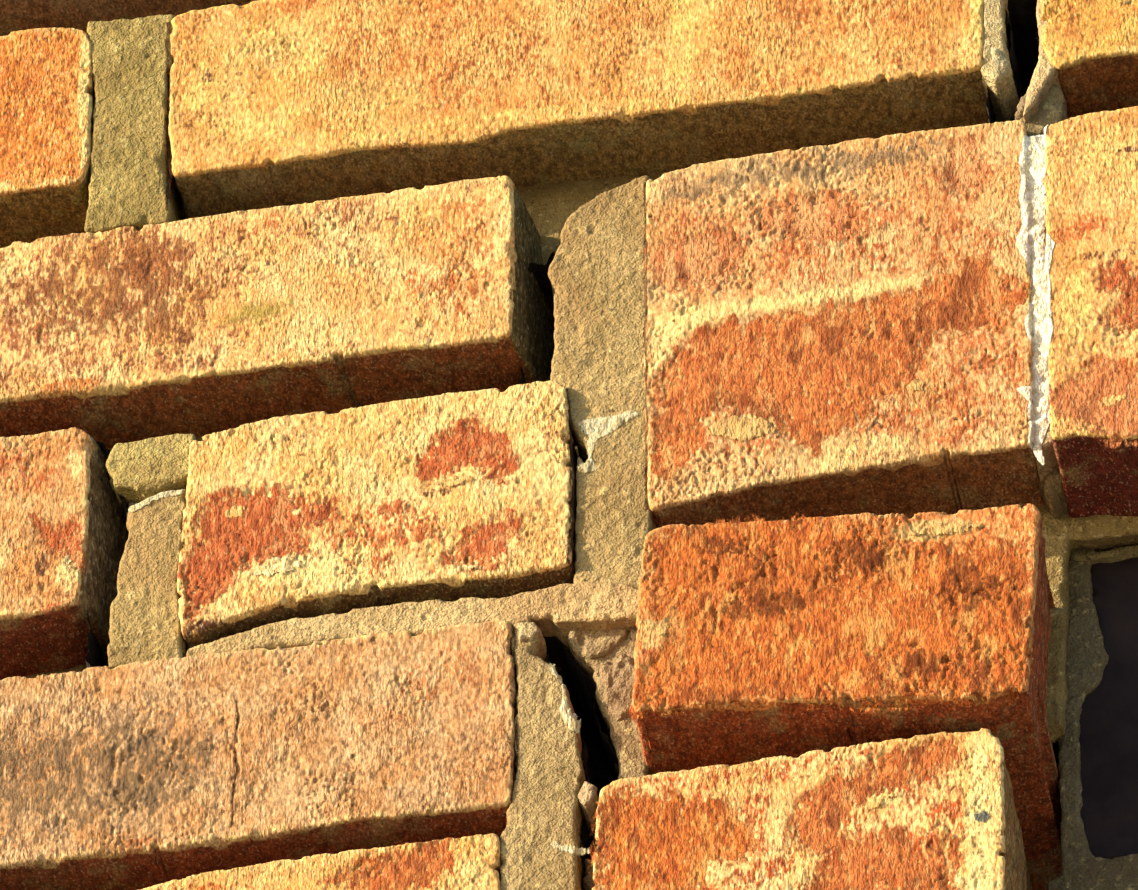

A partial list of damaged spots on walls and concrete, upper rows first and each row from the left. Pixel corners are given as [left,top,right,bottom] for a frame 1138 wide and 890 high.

crack [985,0,1040,124]
crack [519,367,527,384]
crack [528,252,555,316]
water stain [1016,125,1055,465]
crack [566,389,587,567]
crack [510,627,519,803]
crack [544,636,619,890]